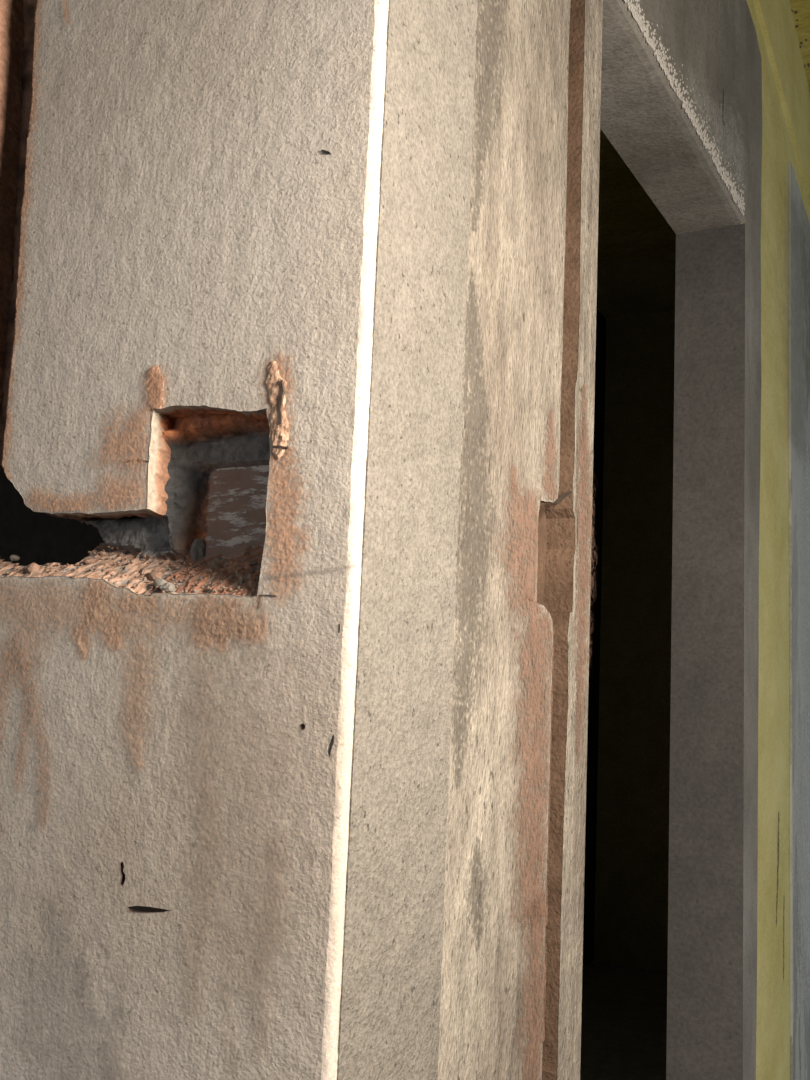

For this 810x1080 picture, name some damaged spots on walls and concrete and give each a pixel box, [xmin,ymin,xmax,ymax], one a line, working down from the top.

corrosion [13,0,41,346]
corrosion [2,380,12,479]
corrosion [265,452,306,595]